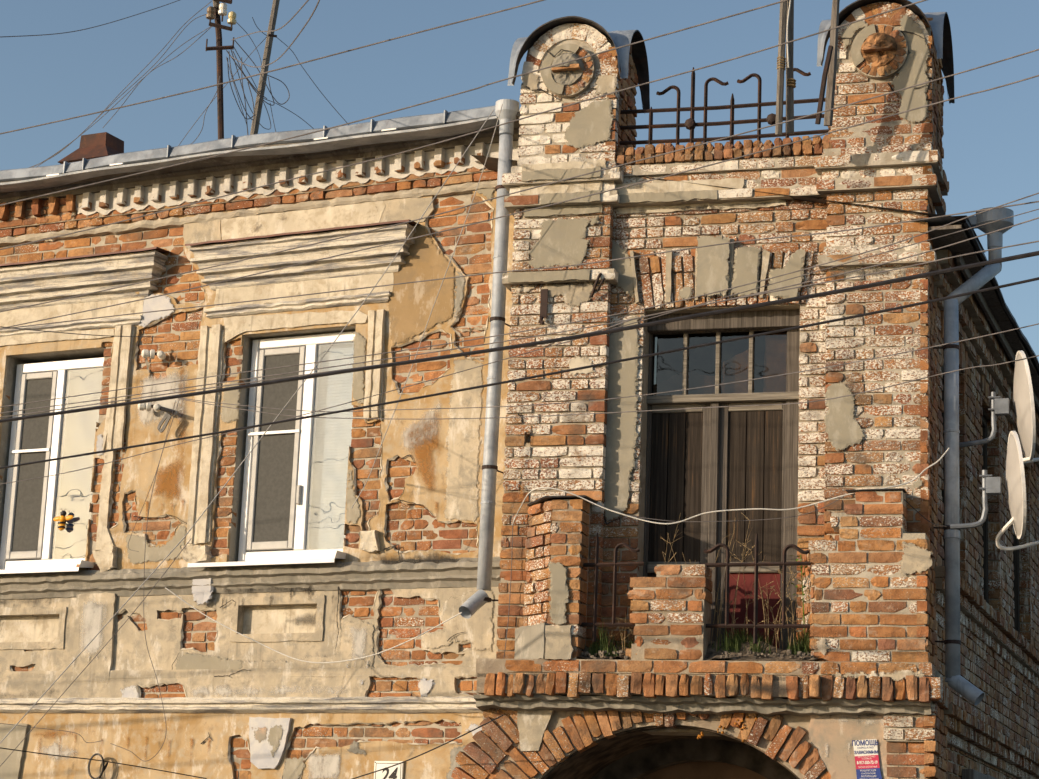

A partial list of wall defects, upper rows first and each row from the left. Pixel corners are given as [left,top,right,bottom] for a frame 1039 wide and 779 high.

flaking render [0,227,205,380]
flaking render [391,194,494,394]
flaking render [221,339,245,385]
flaking render [76,406,181,570]
flaking render [211,431,237,558]
flaking render [345,405,479,555]
flaking render [115,608,148,631]
flaking render [121,683,187,698]
flaking render [159,608,217,652]
flaking render [339,590,480,697]
flaking render [282,719,462,779]